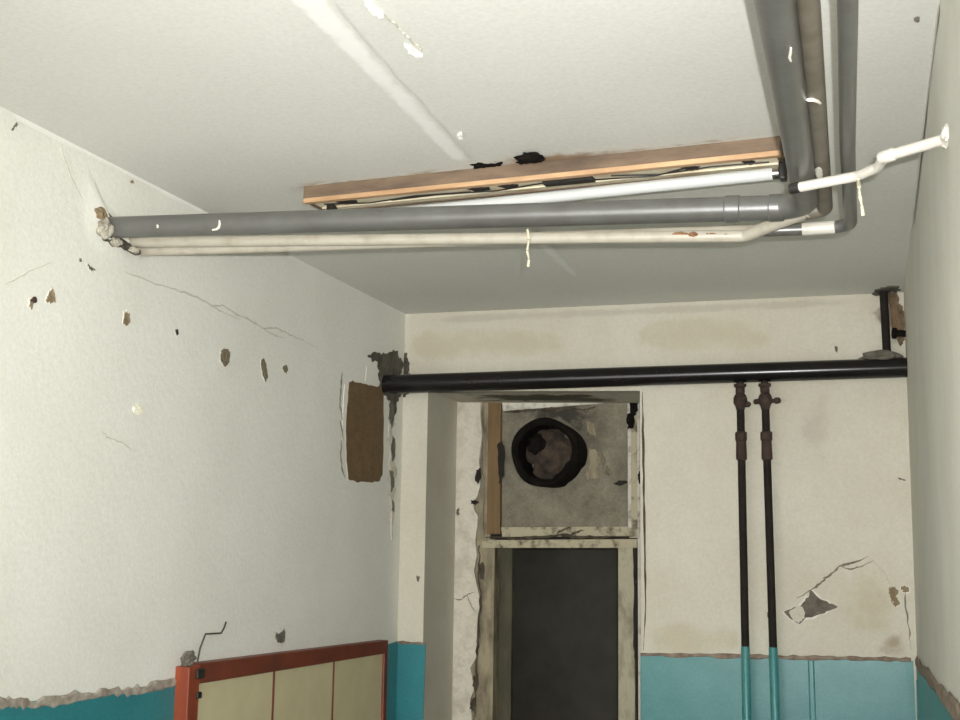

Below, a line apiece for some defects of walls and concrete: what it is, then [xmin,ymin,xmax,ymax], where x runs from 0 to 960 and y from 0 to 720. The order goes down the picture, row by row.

peeling [404,43,423,58]
flaking render [94,207,141,256]
crack [124,271,318,348]
flaking render [219,347,230,368]
flaking render [260,357,268,384]
flaking render [342,350,410,540]
flaking render [273,627,287,648]
flaking render [782,589,838,626]
crack [797,556,874,598]
flaking render [889,584,911,607]
crack [903,593,911,647]